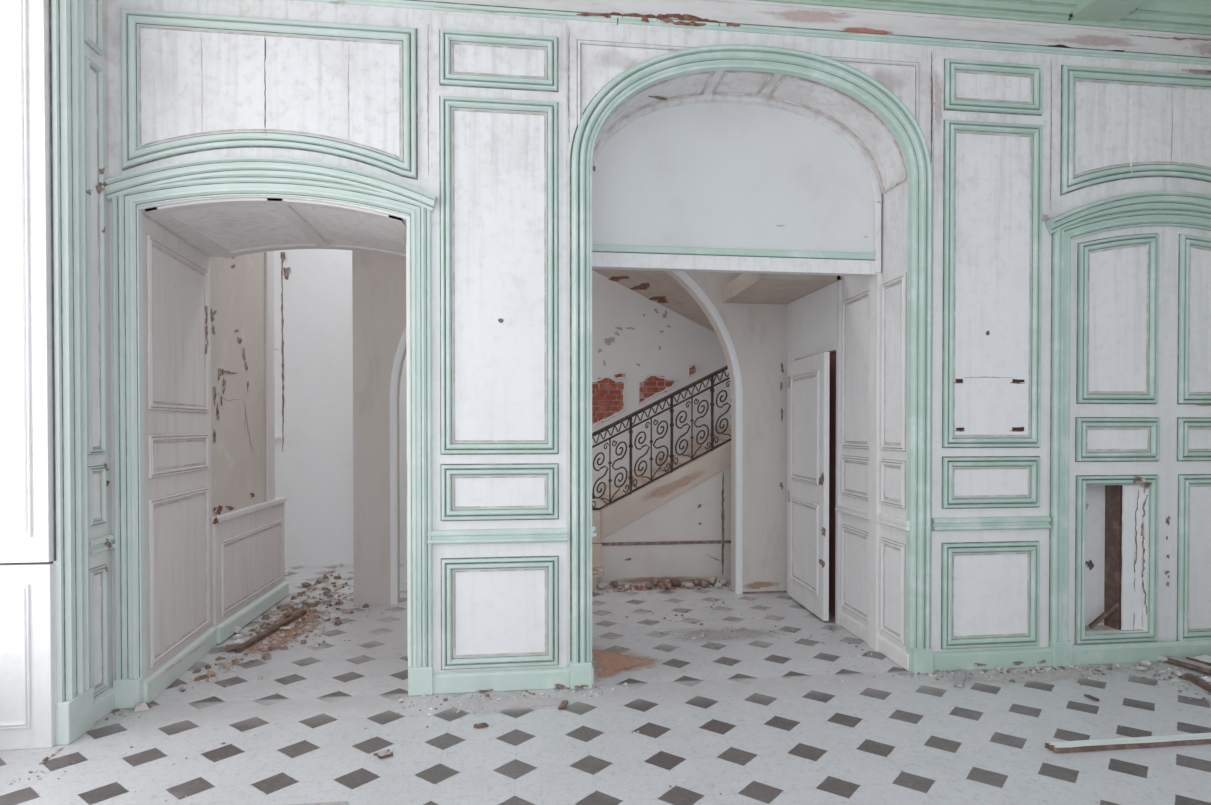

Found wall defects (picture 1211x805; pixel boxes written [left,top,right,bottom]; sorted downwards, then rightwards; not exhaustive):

peeling [609,276,671,350]
peeling [213,330,249,443]
flaking render [592,327,698,427]
peeling [213,505,234,524]